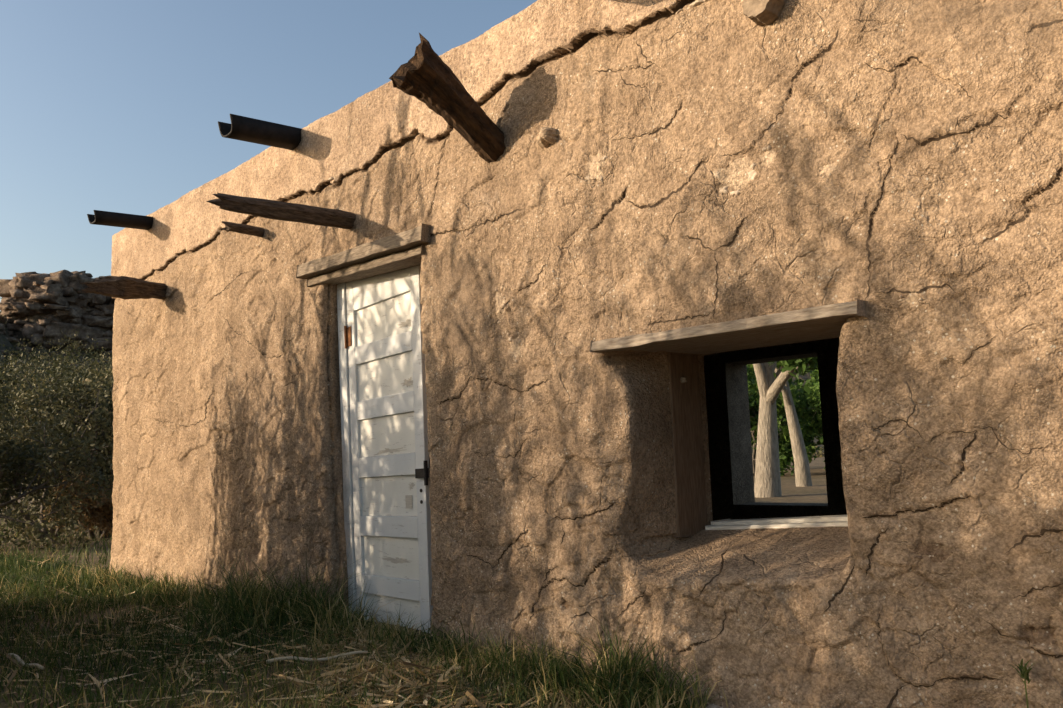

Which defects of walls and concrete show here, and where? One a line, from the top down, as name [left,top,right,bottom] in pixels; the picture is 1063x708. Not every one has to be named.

crack [590,19,908,230]
crack [864,56,974,99]
crack [1028,19,1063,32]
crack [427,130,520,237]
crack [846,96,1063,306]
crack [496,265,545,323]
crack [652,217,747,324]
crack [440,376,549,404]
crack [824,419,1063,612]
crack [530,502,676,655]
crack [676,606,726,655]
crack [877,610,999,708]